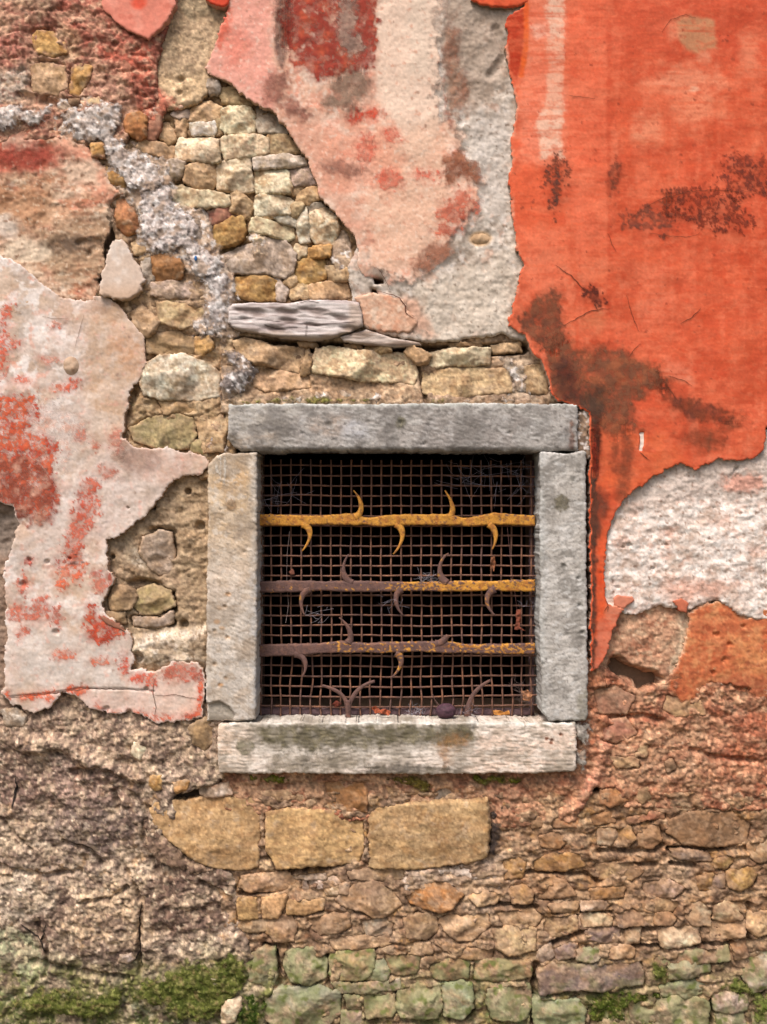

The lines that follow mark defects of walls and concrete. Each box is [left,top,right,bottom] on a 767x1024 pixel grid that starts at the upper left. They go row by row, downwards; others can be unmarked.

spalling [0,0,563,671]
water stain [543,151,571,222]
water stain [581,284,608,307]
water stain [517,288,739,668]
water stain [622,153,767,239]
spalling [0,429,767,1024]